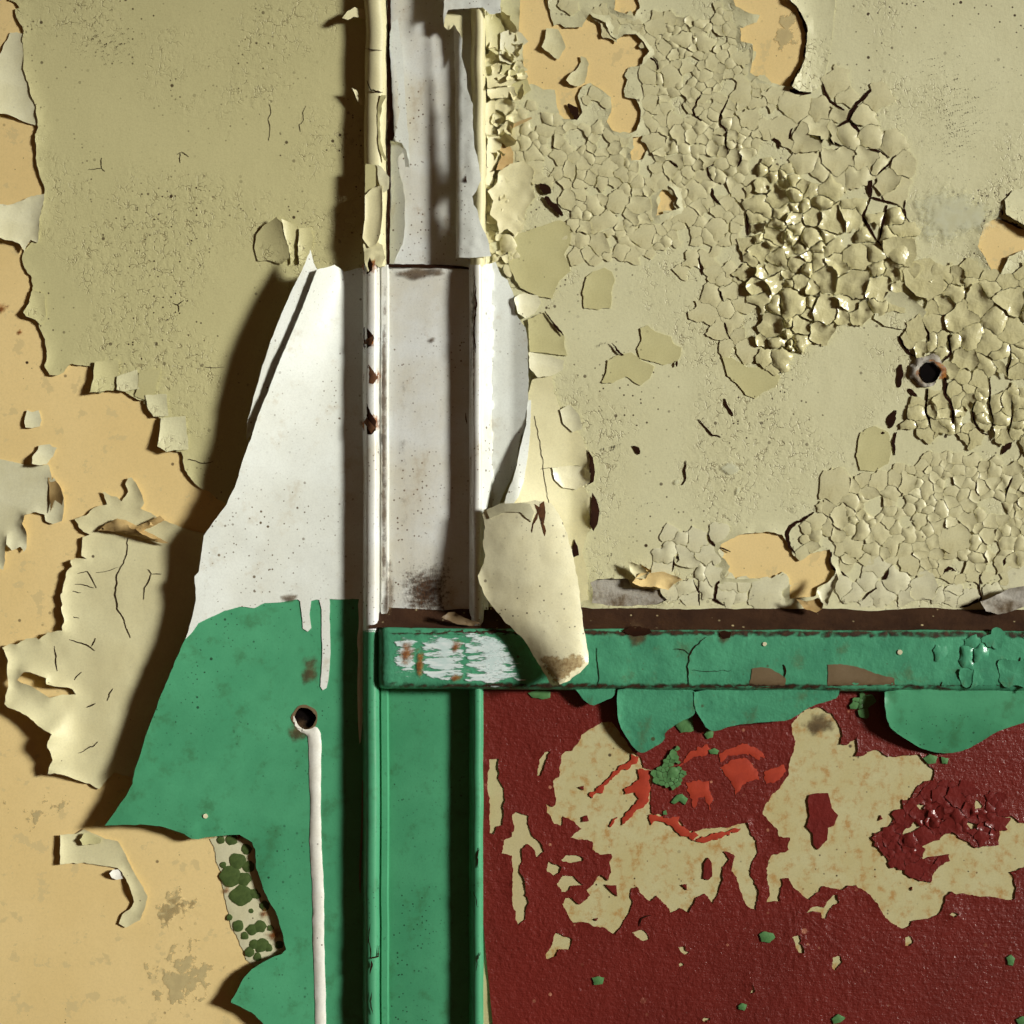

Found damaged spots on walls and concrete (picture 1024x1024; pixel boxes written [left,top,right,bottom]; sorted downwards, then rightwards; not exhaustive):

crack [789,0,909,246]
crack [692,95,742,205]
crack [539,183,563,216]
crack [881,326,1012,455]
crack [699,398,734,437]
peeling [443,0,1024,946]
peeling [0,19,410,1024]
crack [785,512,814,554]
crack [672,556,724,606]
crack [944,560,1006,608]
peeling [546,932,572,959]
peeling [792,936,804,953]